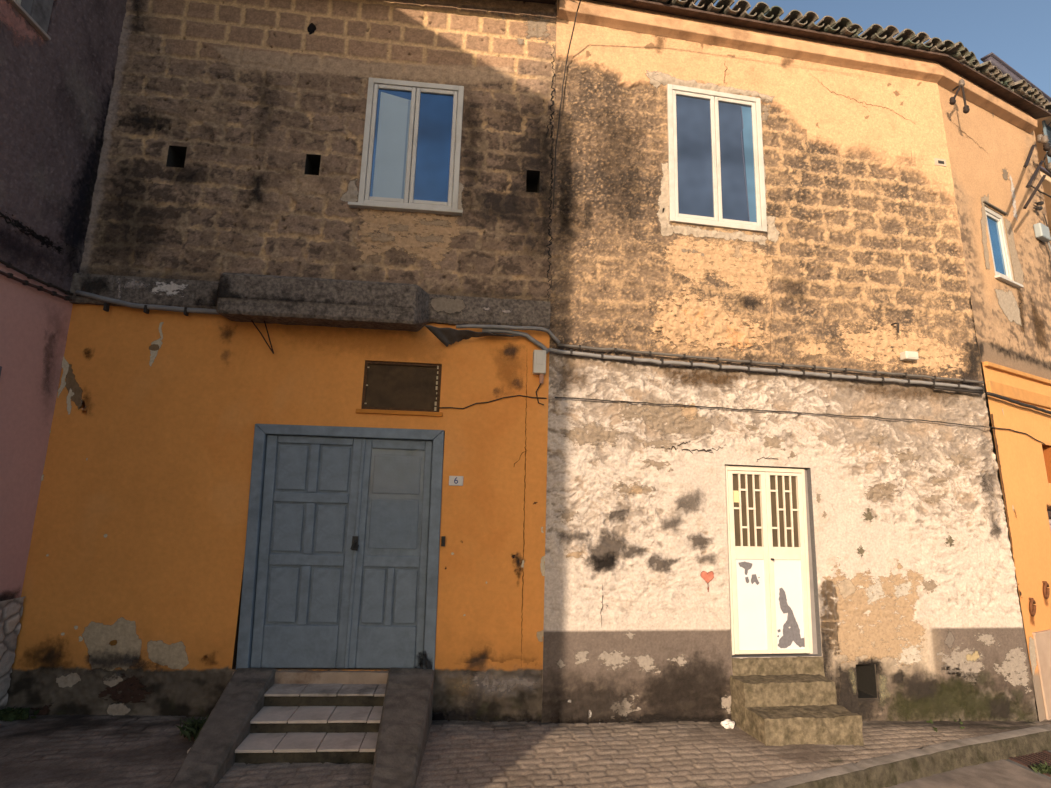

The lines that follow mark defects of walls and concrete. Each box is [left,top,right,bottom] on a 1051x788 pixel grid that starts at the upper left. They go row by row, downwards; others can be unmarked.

damp [541,133,589,246]
crack [0,212,63,254]
crack [651,441,727,454]
damp [560,509,677,572]
damp [664,492,699,530]
damp [688,535,714,563]
peeling [991,408,1015,563]
flaking render [820,546,940,670]
peeling [61,617,189,716]
peeling [555,649,687,674]
peeling [936,630,1037,693]
damp [640,714,724,723]